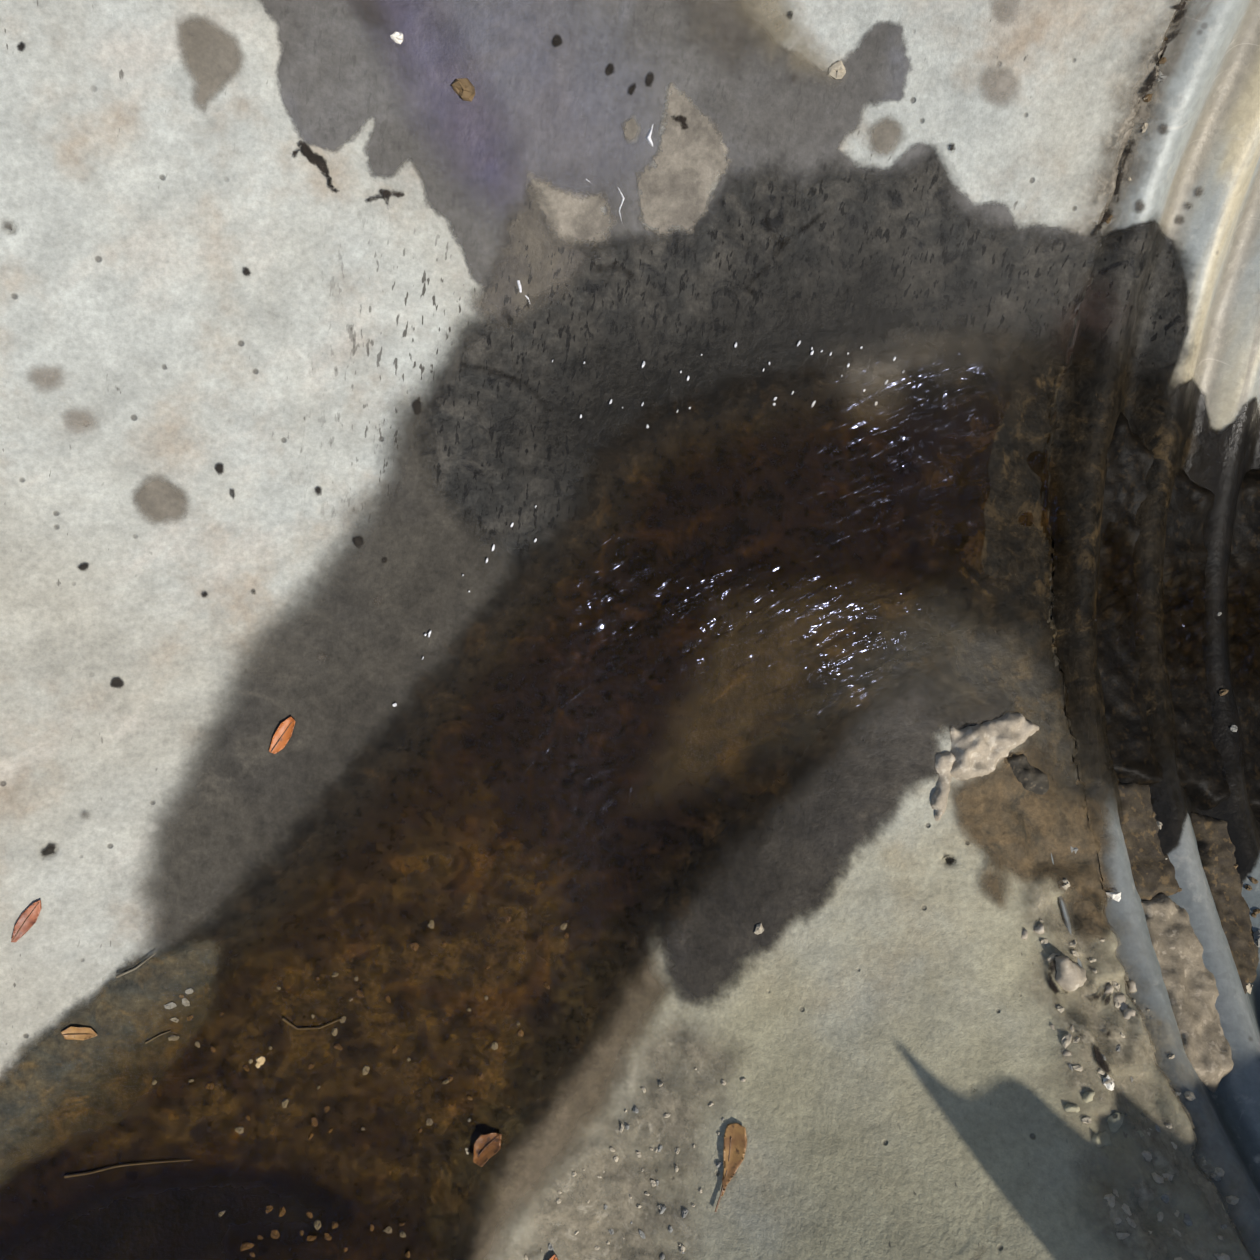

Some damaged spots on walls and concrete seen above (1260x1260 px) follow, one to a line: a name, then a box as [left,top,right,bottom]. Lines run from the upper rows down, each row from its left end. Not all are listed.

crack [1138,0,1187,104]
crack [1091,139,1135,236]
leakage [135,478,187,522]
leakage [148,0,1260,955]
spalling [931,712,1039,821]
leakage [472,649,1010,1260]
spalling [1021,883,1252,1260]